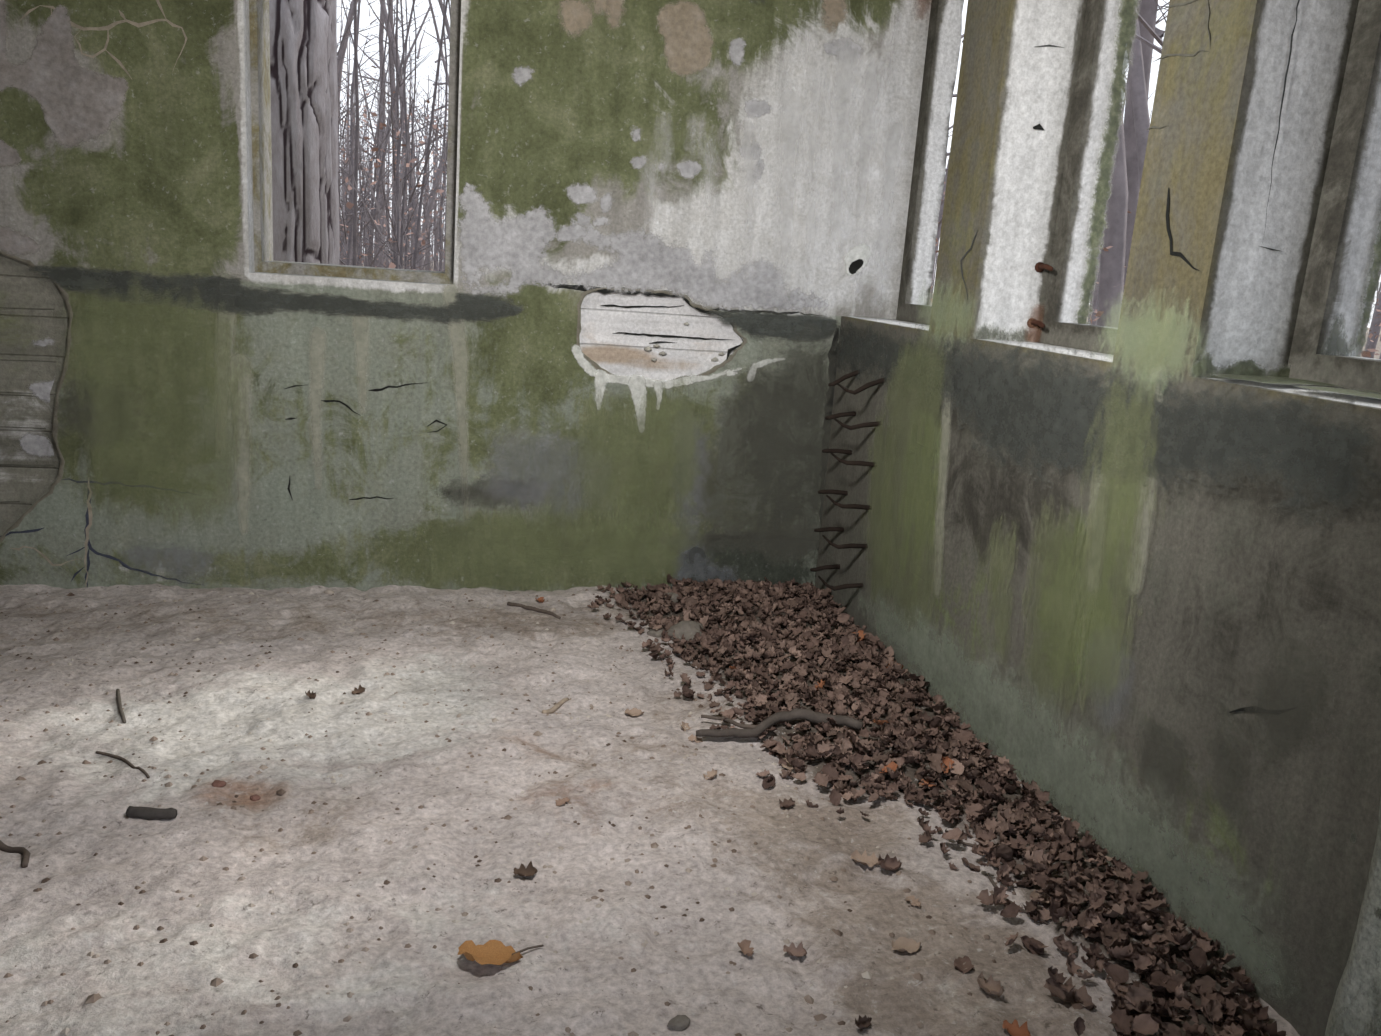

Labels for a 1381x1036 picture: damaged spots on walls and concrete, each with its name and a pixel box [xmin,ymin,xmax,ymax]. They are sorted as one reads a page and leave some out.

peeling [0,0,128,148]
peeling [513,67,533,85]
peeling [631,129,702,178]
peeling [658,1,746,75]
crack [1260,0,1300,252]
peeling [457,183,827,382]
crack [1166,188,1200,271]
spalling [0,226,73,542]
crack [0,478,200,587]
crack [285,382,429,420]
crack [349,494,394,502]
leakage [572,310,1380,595]